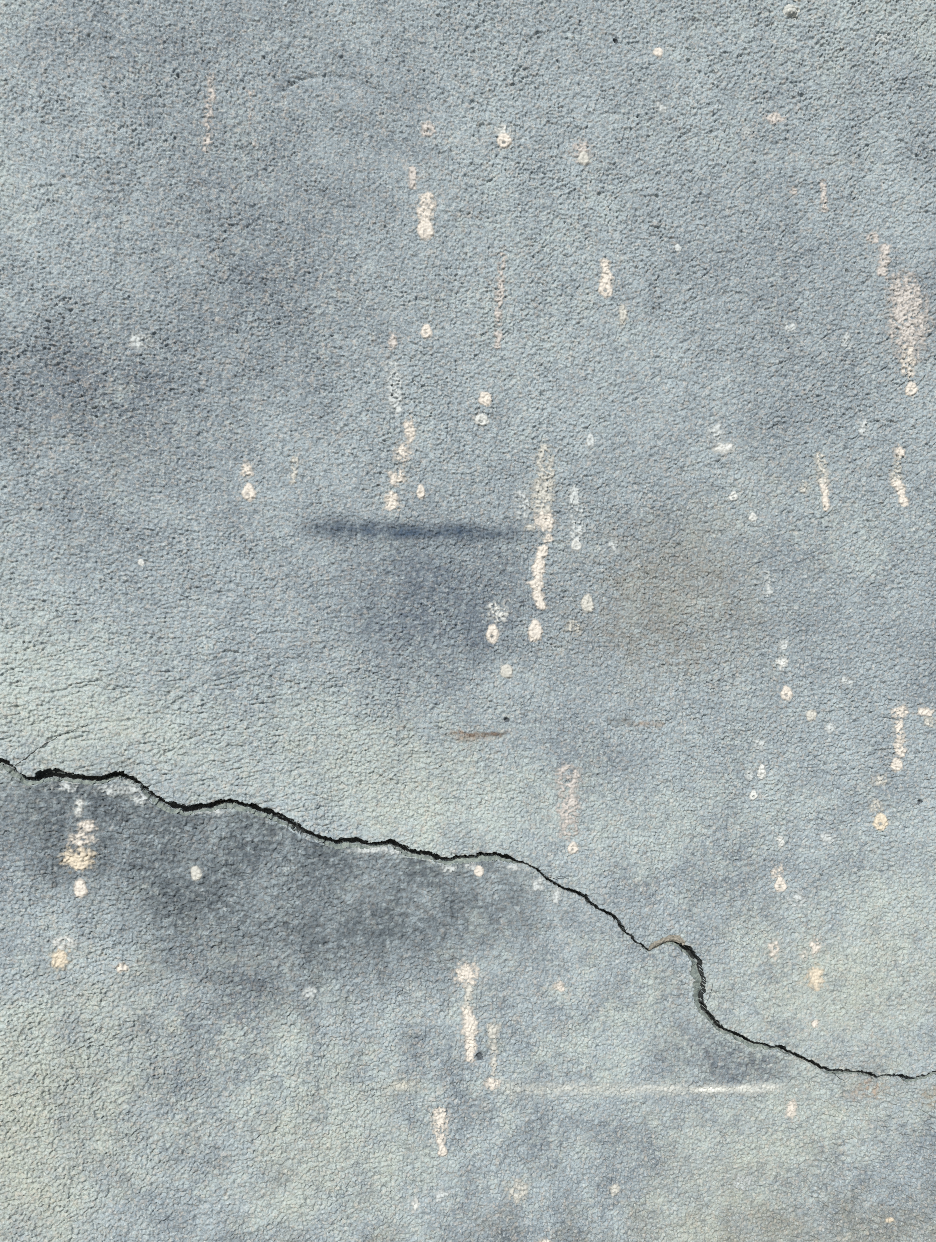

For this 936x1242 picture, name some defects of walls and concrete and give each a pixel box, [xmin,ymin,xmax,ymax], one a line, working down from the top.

crack [0,724,936,1082]